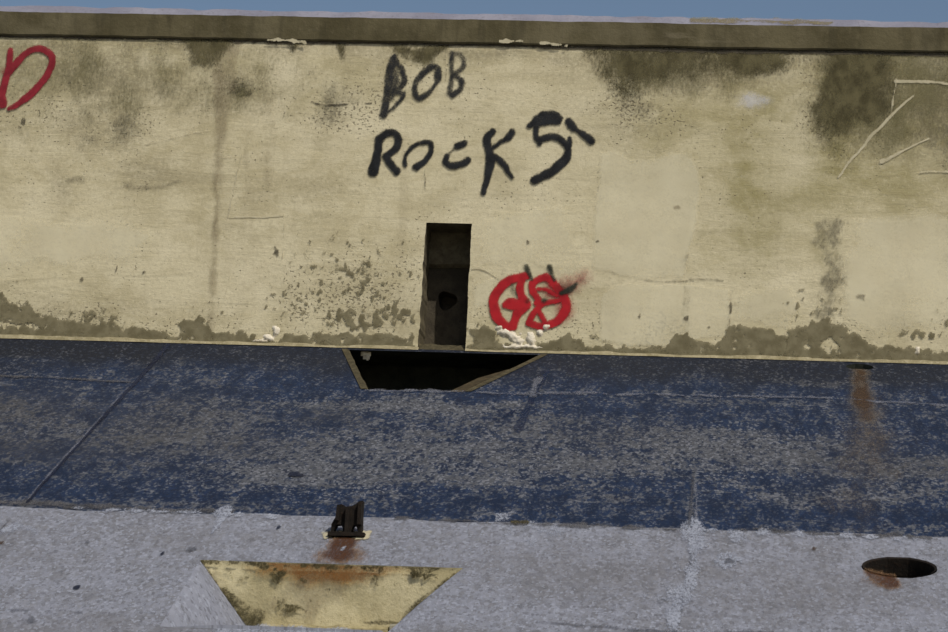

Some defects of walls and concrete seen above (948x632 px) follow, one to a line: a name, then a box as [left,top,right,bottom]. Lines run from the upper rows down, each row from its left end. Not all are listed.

damp [812,51,948,144]
corrosion [254,531,397,588]